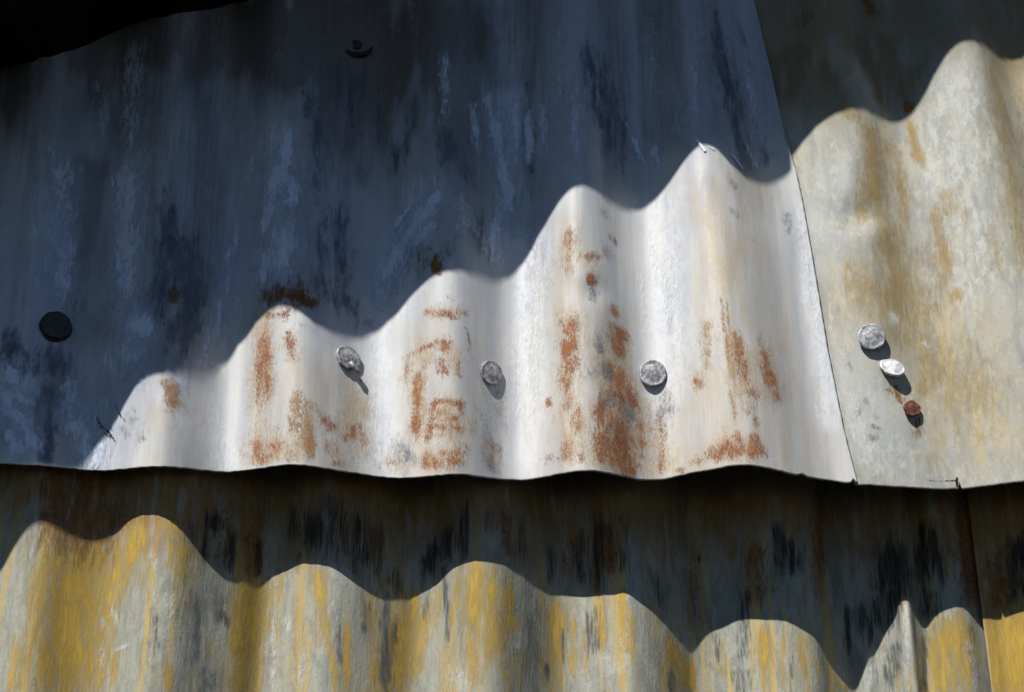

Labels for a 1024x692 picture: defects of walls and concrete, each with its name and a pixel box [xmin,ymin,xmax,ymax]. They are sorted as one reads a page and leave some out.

corrosion [417,246,444,275]
corrosion [563,230,607,286]
corrosion [161,379,180,410]
corrosion [241,276,370,466]
corrosion [405,335,476,470]
corrosion [545,304,683,477]
corrosion [697,299,782,466]